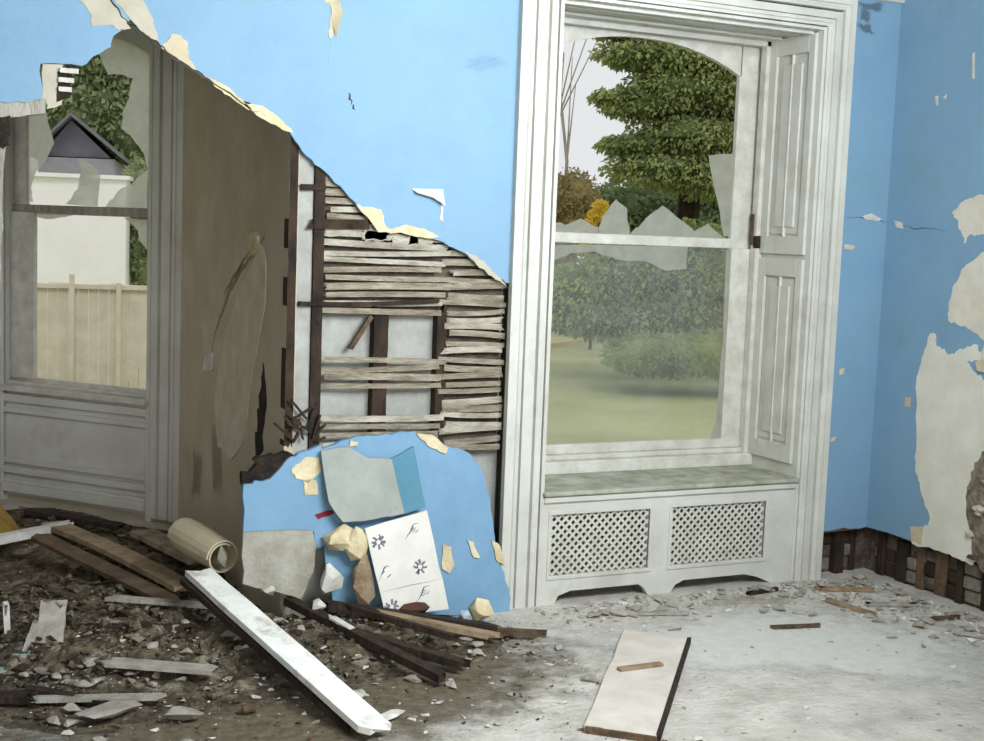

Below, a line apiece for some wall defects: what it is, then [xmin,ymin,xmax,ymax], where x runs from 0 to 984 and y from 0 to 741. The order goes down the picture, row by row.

peeling [80,0,293,133]
peeling [324,0,343,69]
peeling [952,194,984,243]
spalling [322,186,507,451]
peeling [905,252,984,573]
flaking render [239,450,294,486]
flaking render [458,610,472,620]